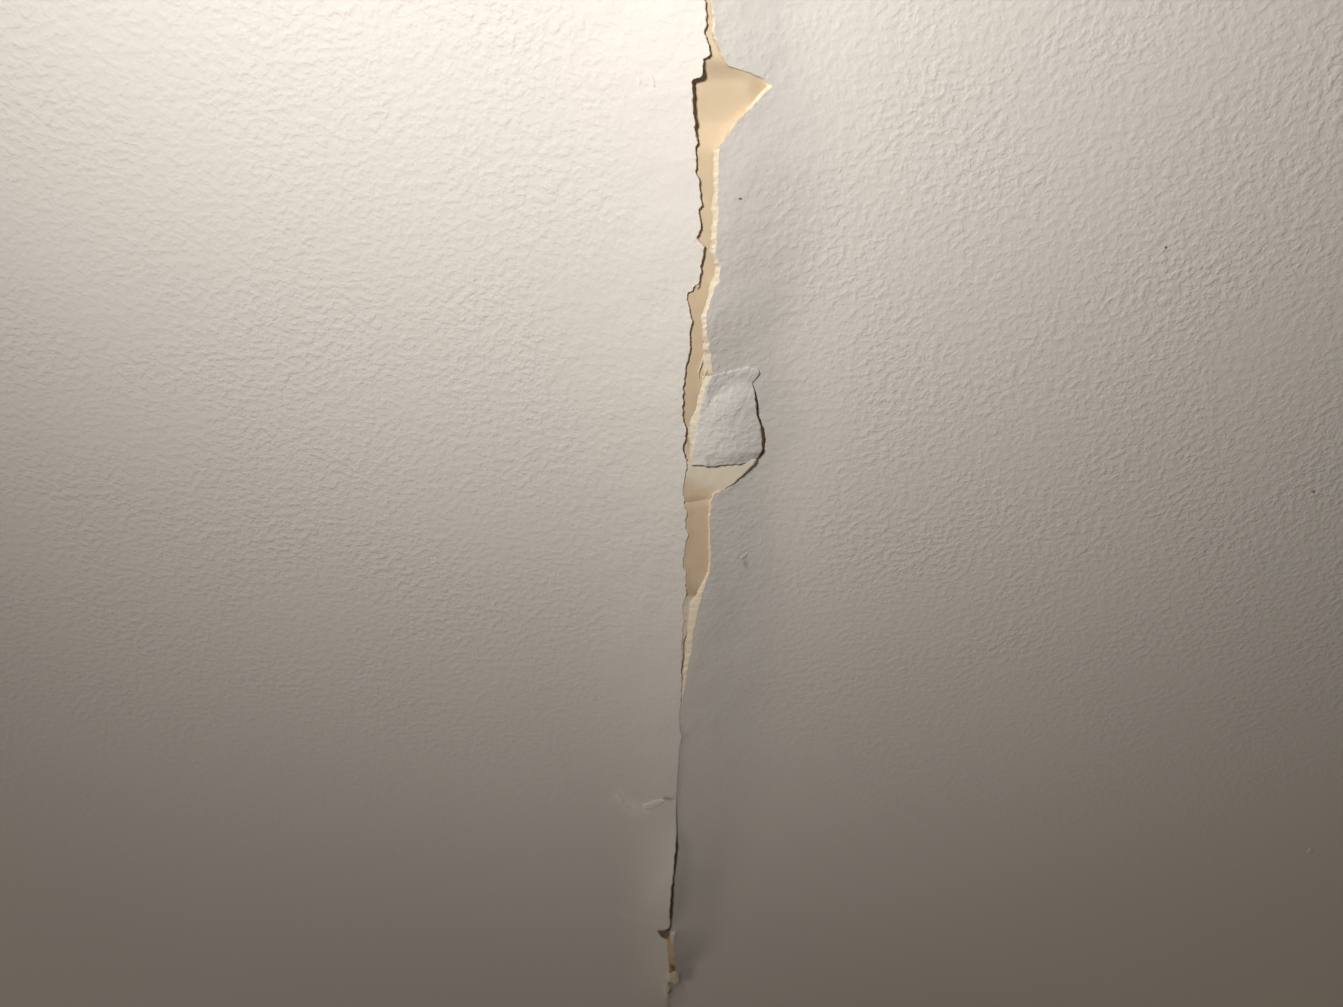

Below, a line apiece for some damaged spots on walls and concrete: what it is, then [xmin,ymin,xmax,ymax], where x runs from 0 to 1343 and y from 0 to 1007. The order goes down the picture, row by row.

crack [661,714,682,929]